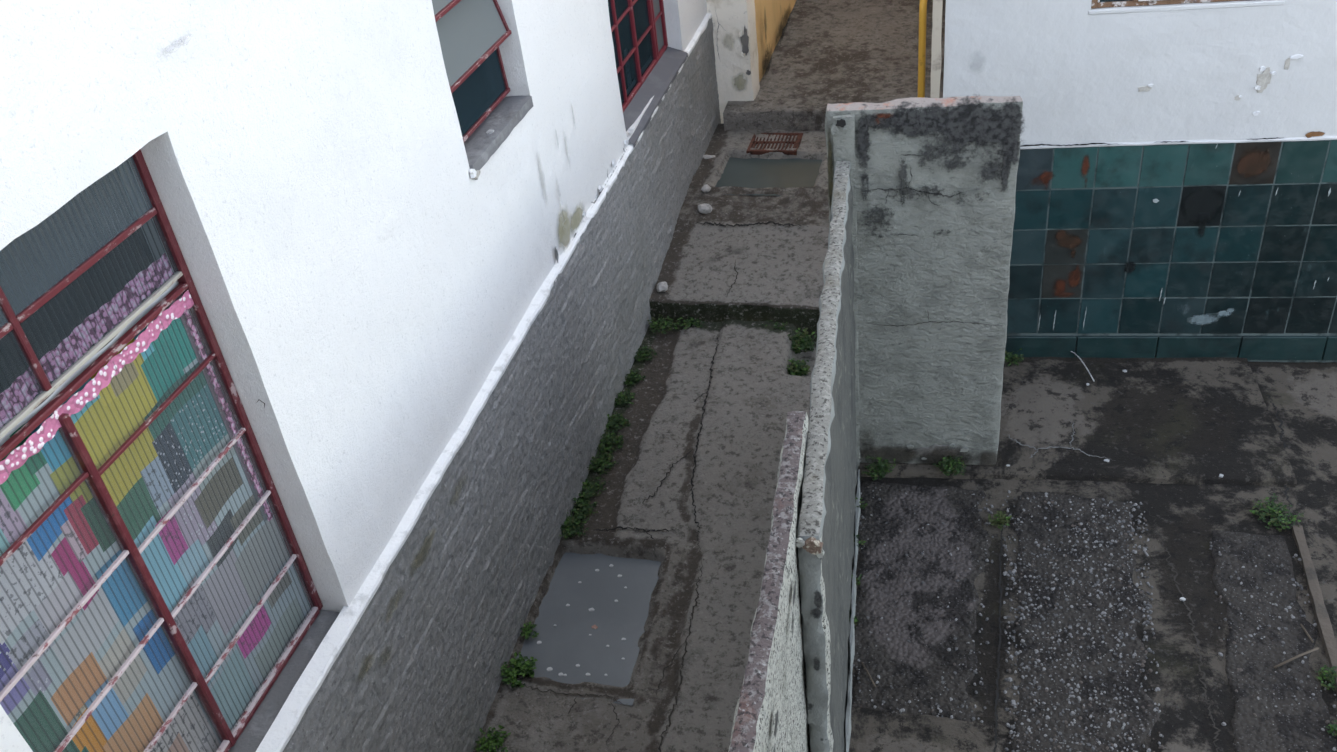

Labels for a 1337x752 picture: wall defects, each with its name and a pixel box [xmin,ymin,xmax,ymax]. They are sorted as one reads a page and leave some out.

peeling [739,26,751,75]
peeling [1235,54,1303,101]
leakage [857,96,1024,238]
crack [517,333,720,752]